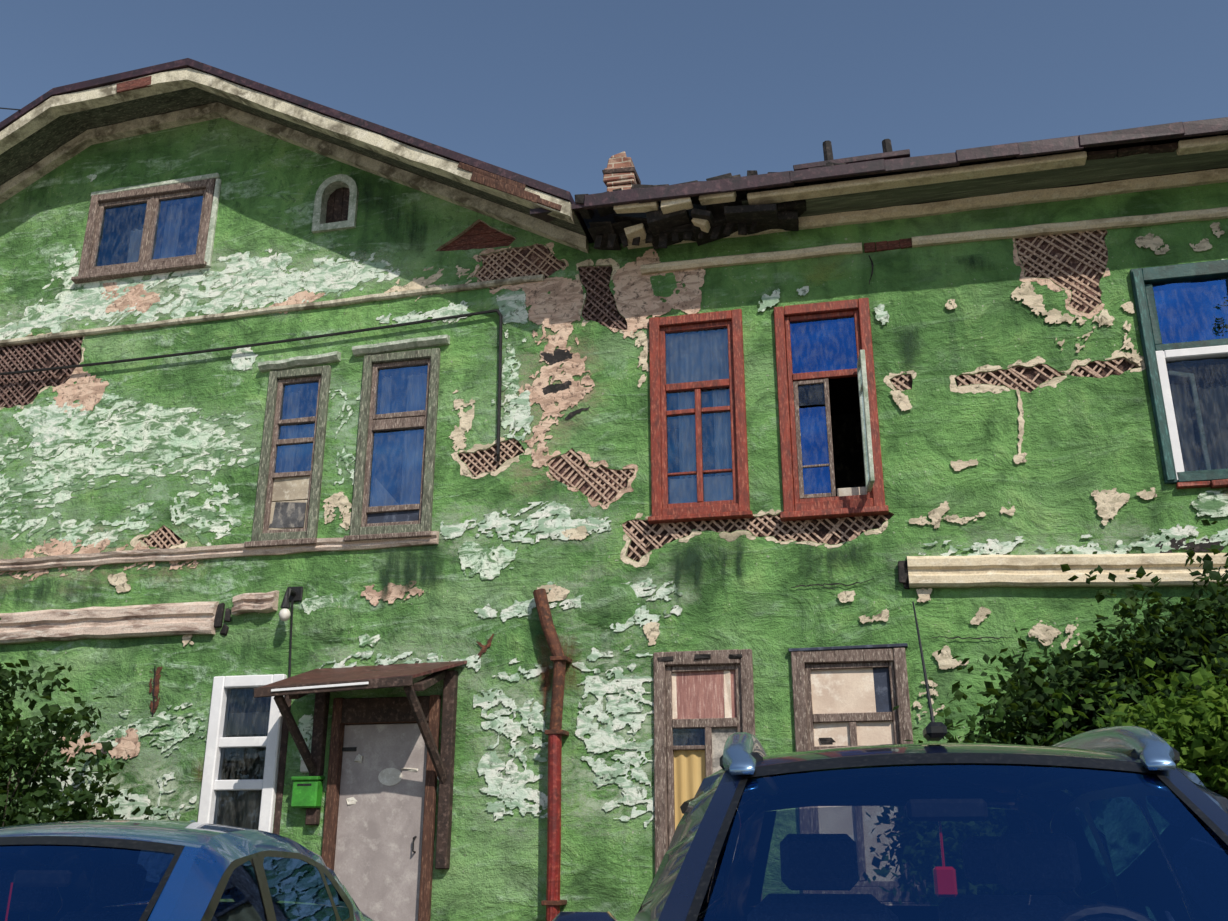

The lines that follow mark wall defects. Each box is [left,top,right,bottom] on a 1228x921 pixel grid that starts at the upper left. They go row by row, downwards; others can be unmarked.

peeling [1189,222,1225,251]
flaking render [950,230,1145,394]
peeling [884,370,916,411]
peeling [950,458,978,471]
peeling [1013,452,1027,464]
peeling [0,242,894,827]
peeling [909,487,1228,556]
peeling [916,587,932,602]
peeling [970,606,991,625]
peeling [1028,617,1082,649]
corrosion [542,647,566,703]
peeling [913,645,969,721]